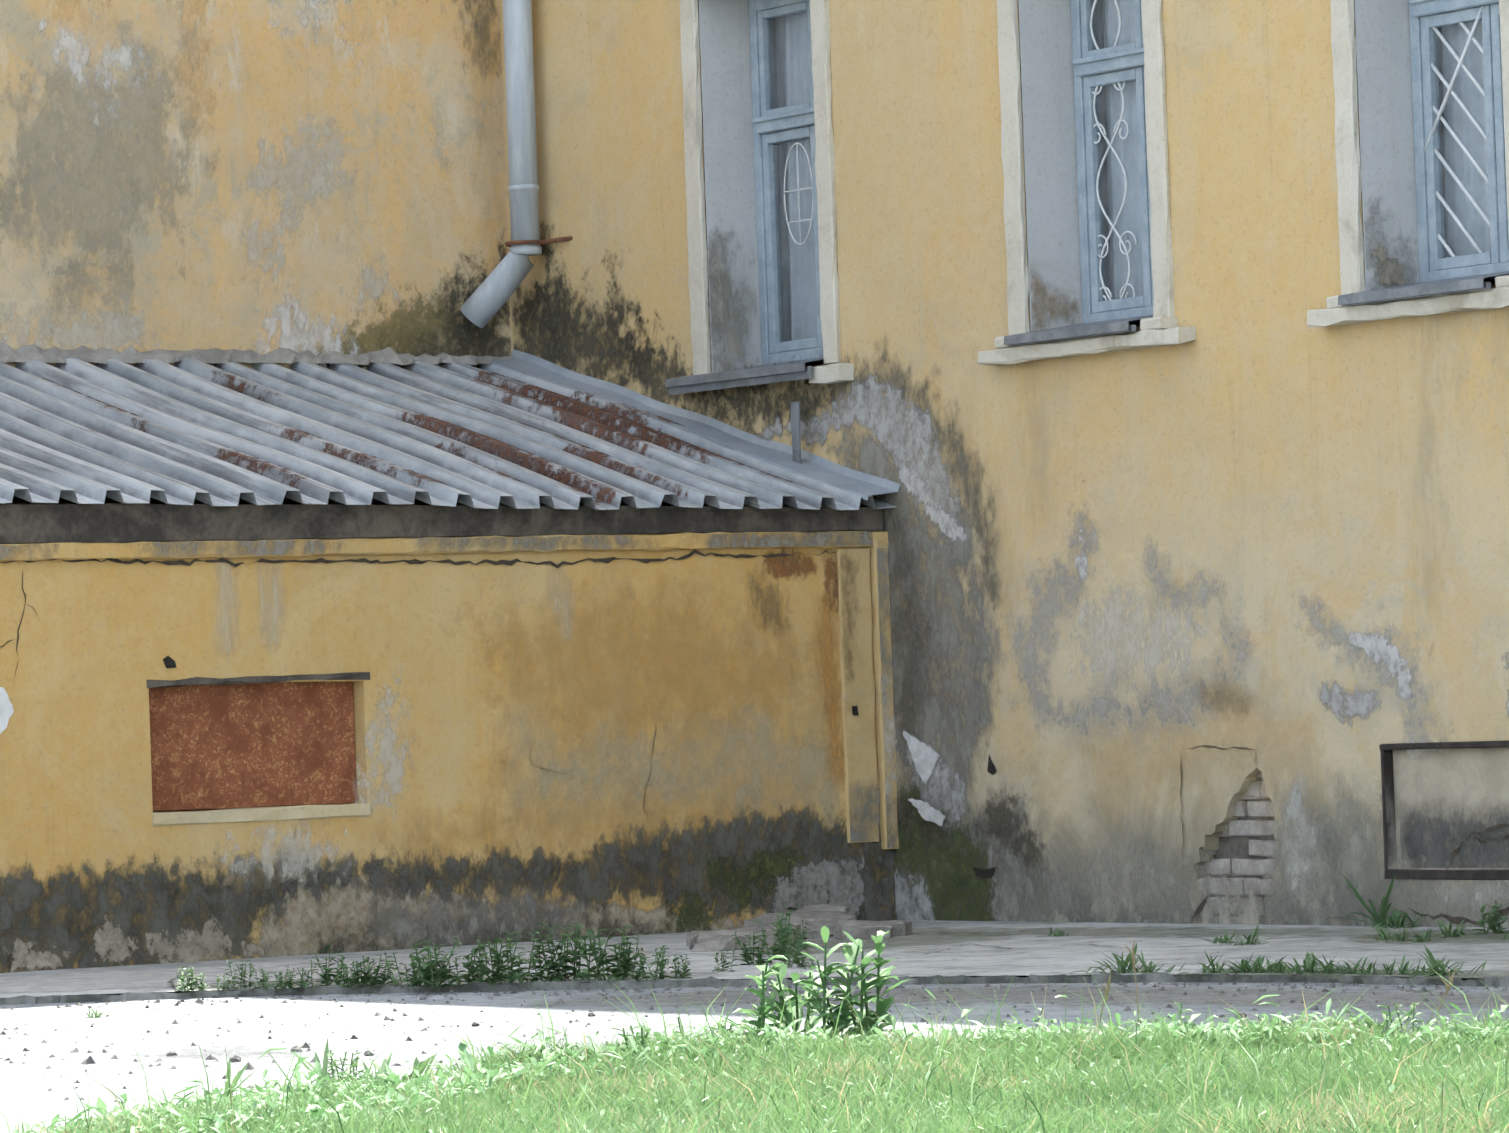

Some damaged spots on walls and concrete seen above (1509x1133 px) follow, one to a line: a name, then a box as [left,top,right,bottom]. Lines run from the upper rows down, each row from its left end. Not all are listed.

water stain [467,0,495,57]
water stain [247,117,345,276]
water stain [317,224,841,435]
corrosion [212,372,278,400]
corrosion [214,448,304,488]
corrosion [280,429,444,485]
crack [0,549,837,683]
spalling [0,687,14,734]
water stain [0,427,1509,973]
peeling [903,731,965,838]
spalling [987,755,996,775]
spalling [1198,772,1277,924]